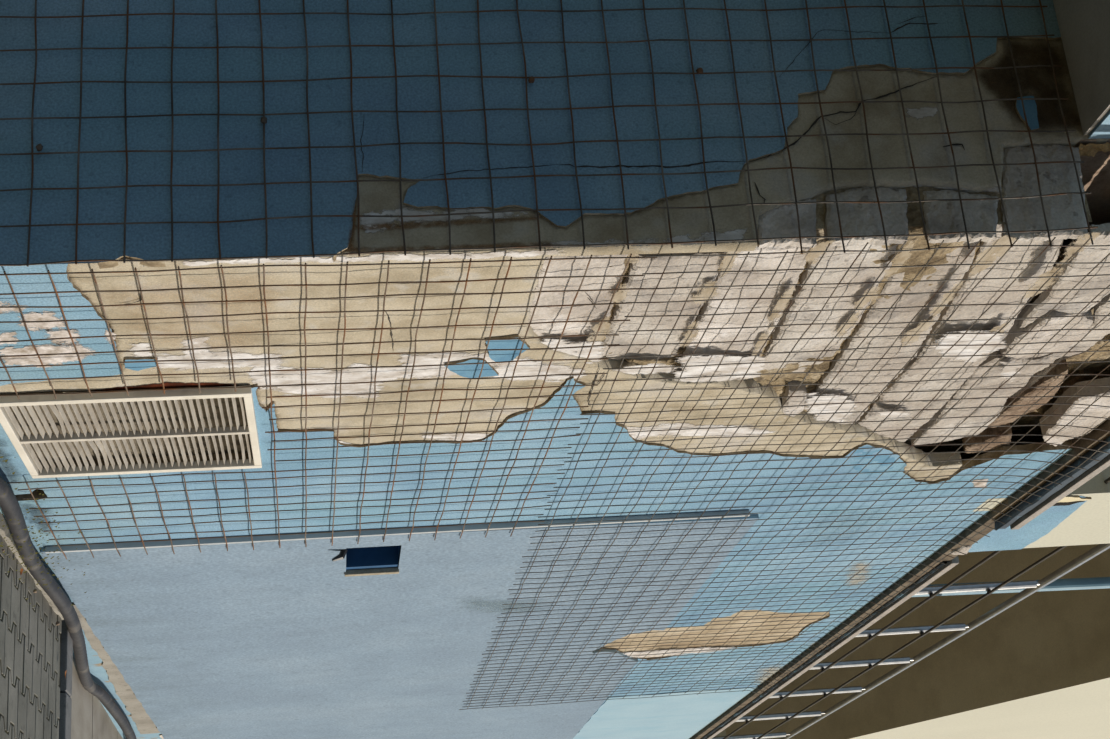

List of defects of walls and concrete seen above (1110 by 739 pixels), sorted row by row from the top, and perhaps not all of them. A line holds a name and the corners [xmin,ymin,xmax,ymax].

crack [780,16,938,76]
leakage [981,42,1079,129]
crack [425,77,934,203]
rust [348,213,534,252]
flaking render [0,38,1110,481]
rust [88,383,239,392]
peeling [601,610,830,658]